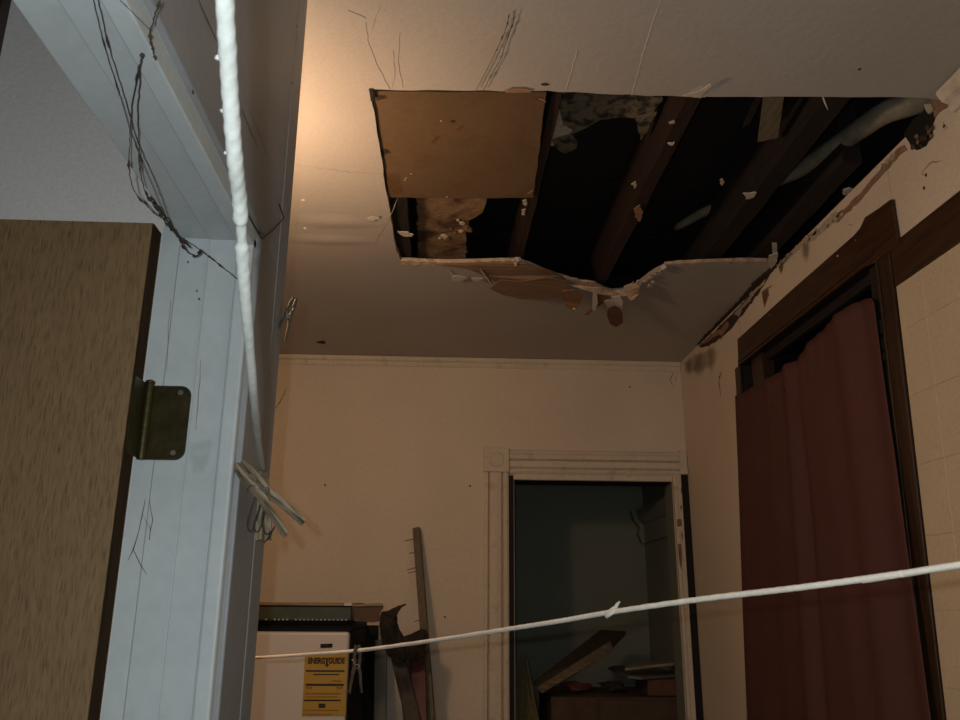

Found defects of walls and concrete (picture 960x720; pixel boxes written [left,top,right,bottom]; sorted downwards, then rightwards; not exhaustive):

crack [348,7,403,89]
spalling [400,99,948,327]
crack [128,499,153,573]